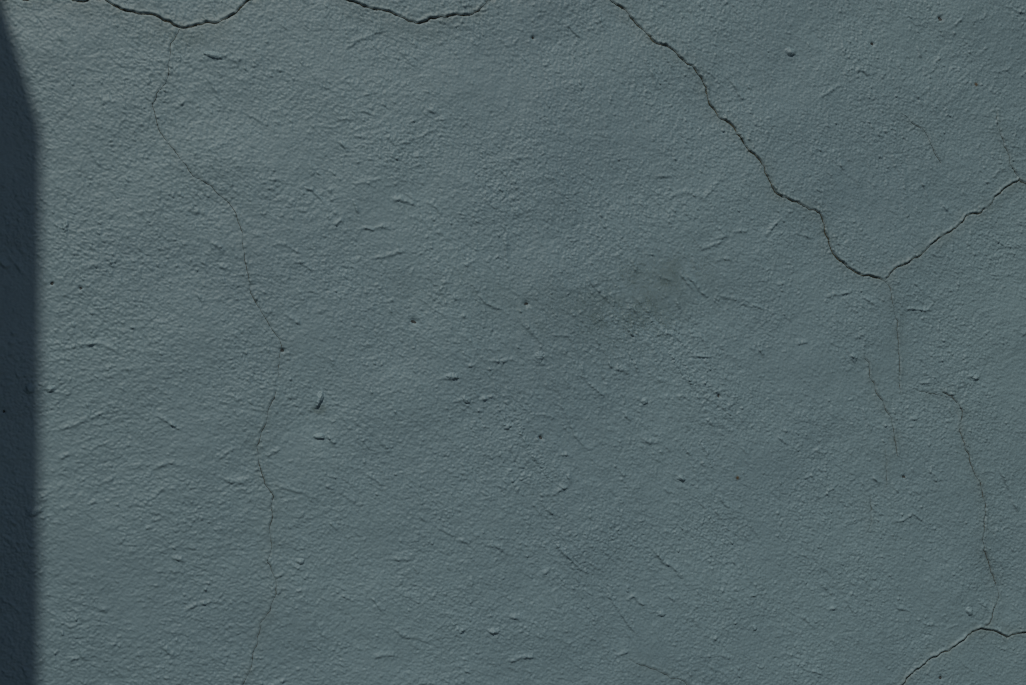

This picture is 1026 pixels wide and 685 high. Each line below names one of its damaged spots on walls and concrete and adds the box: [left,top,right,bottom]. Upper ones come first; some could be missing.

crack [72,0,282,684]
crack [346,0,488,24]
crack [610,0,1026,685]